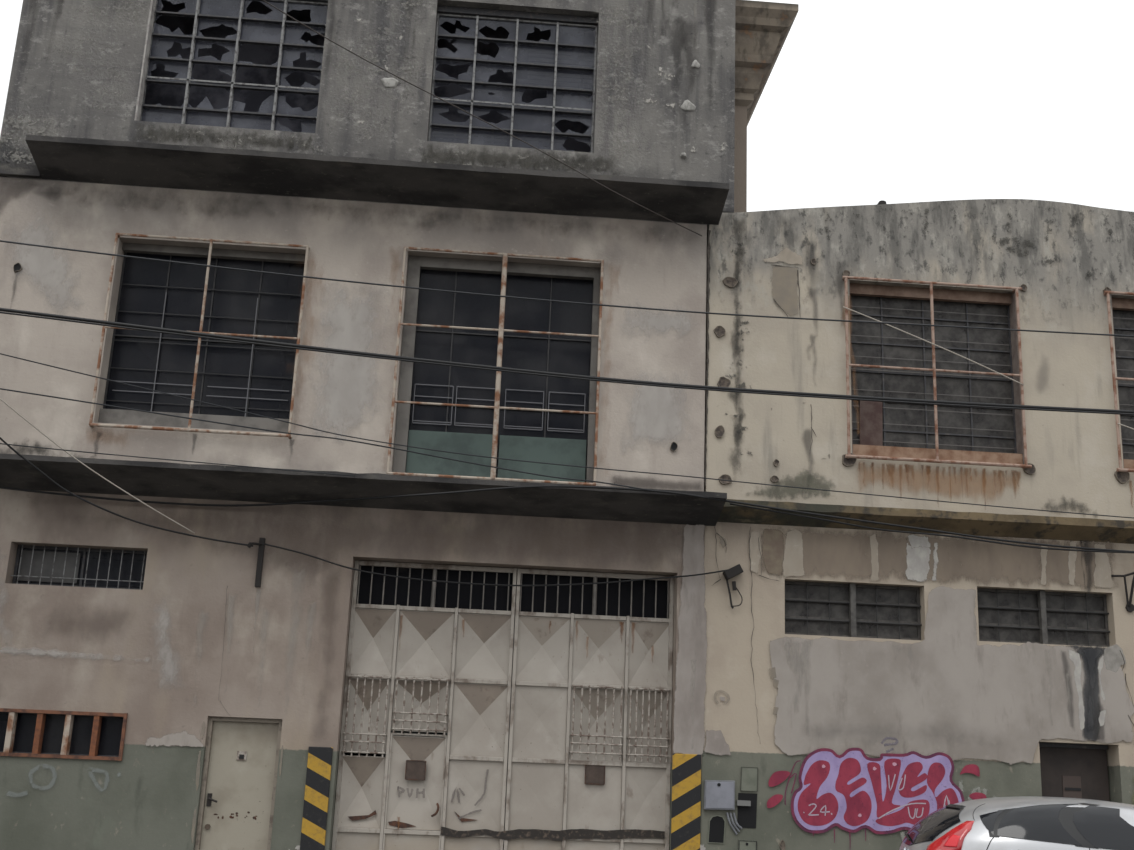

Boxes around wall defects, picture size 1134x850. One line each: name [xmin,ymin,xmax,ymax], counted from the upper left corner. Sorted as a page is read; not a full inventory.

leakage [732,221,746,287]
leakage [763,247,803,316]
leakage [977,208,1053,256]
leakage [725,305,752,463]
corrosion [859,462,1020,492]
peeling [783,529,804,577]
peeling [870,534,879,581]
peeling [905,534,939,582]
peeling [1094,544,1114,588]
leakage [770,586,1134,765]
peeling [1068,649,1085,730]
peeling [1098,656,1106,726]